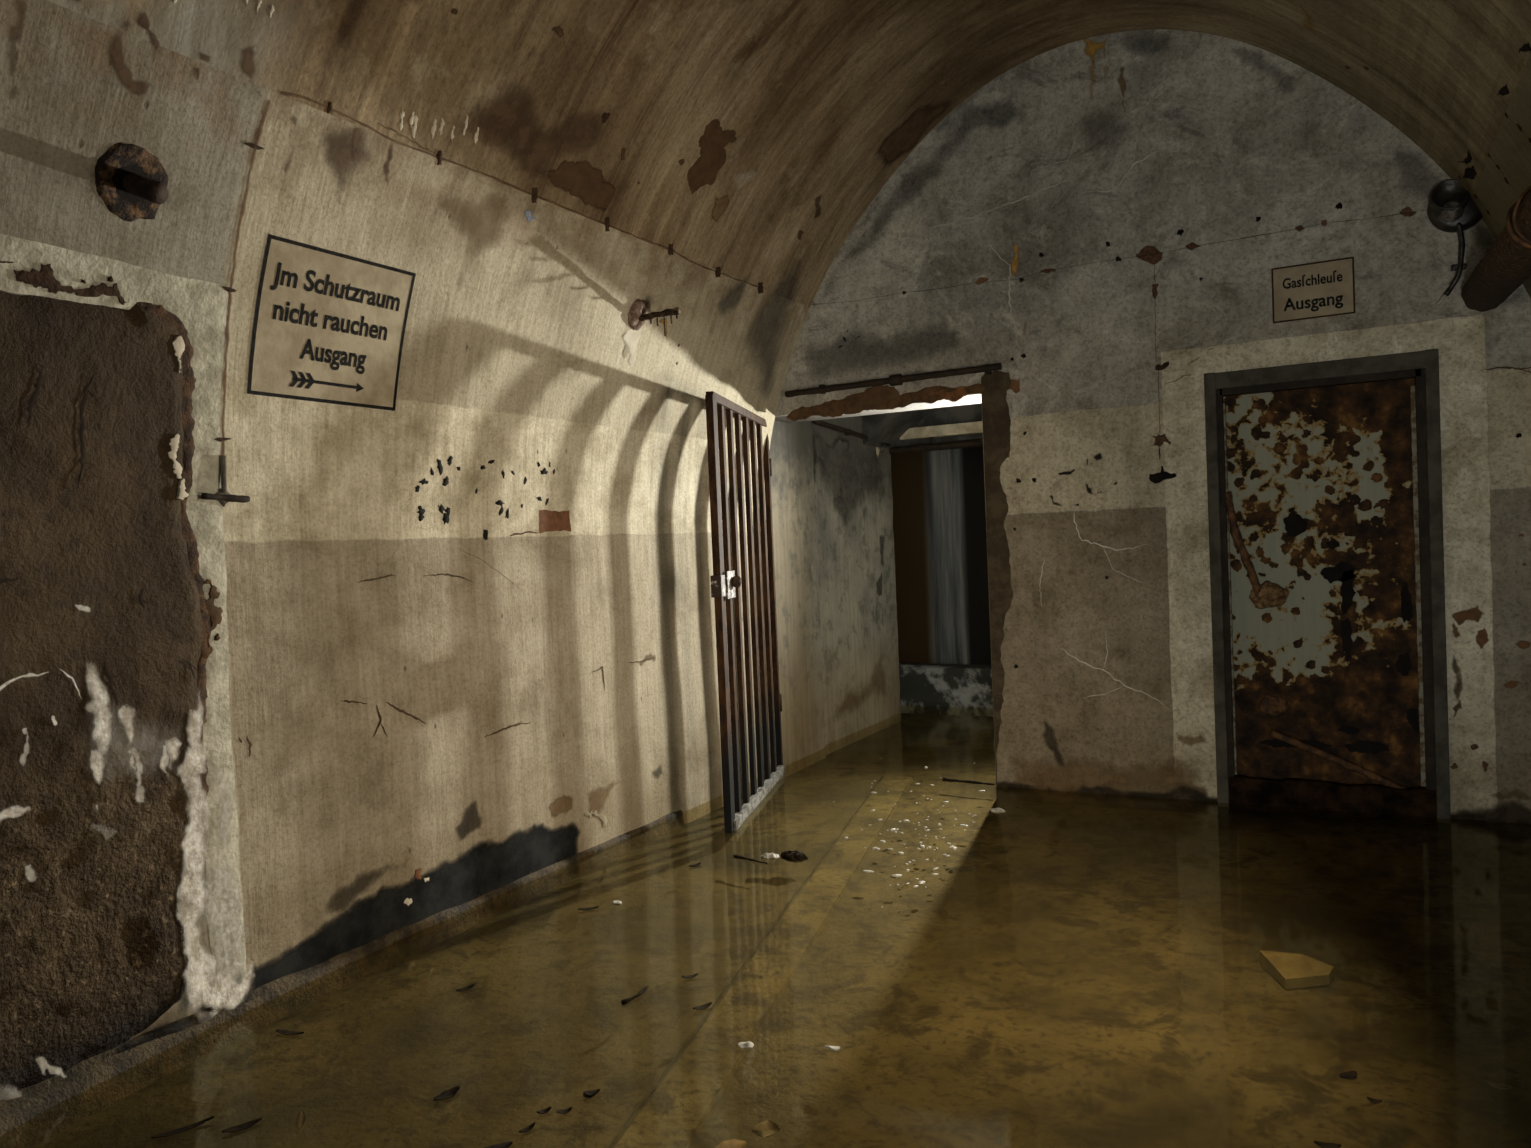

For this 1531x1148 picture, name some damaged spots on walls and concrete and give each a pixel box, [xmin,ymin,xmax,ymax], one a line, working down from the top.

peeling [548,161,616,210]
peeling [678,119,737,194]
rust [1458,151,1517,225]
crack [1074,503,1142,581]
spalling [786,370,1013,792]
spalling [0,261,223,1097]
crack [1061,634,1168,709]
damp [0,664,144,801]
damp [0,805,30,820]
damp [590,784,613,815]
damp [26,865,36,881]
damp [118,702,580,1053]